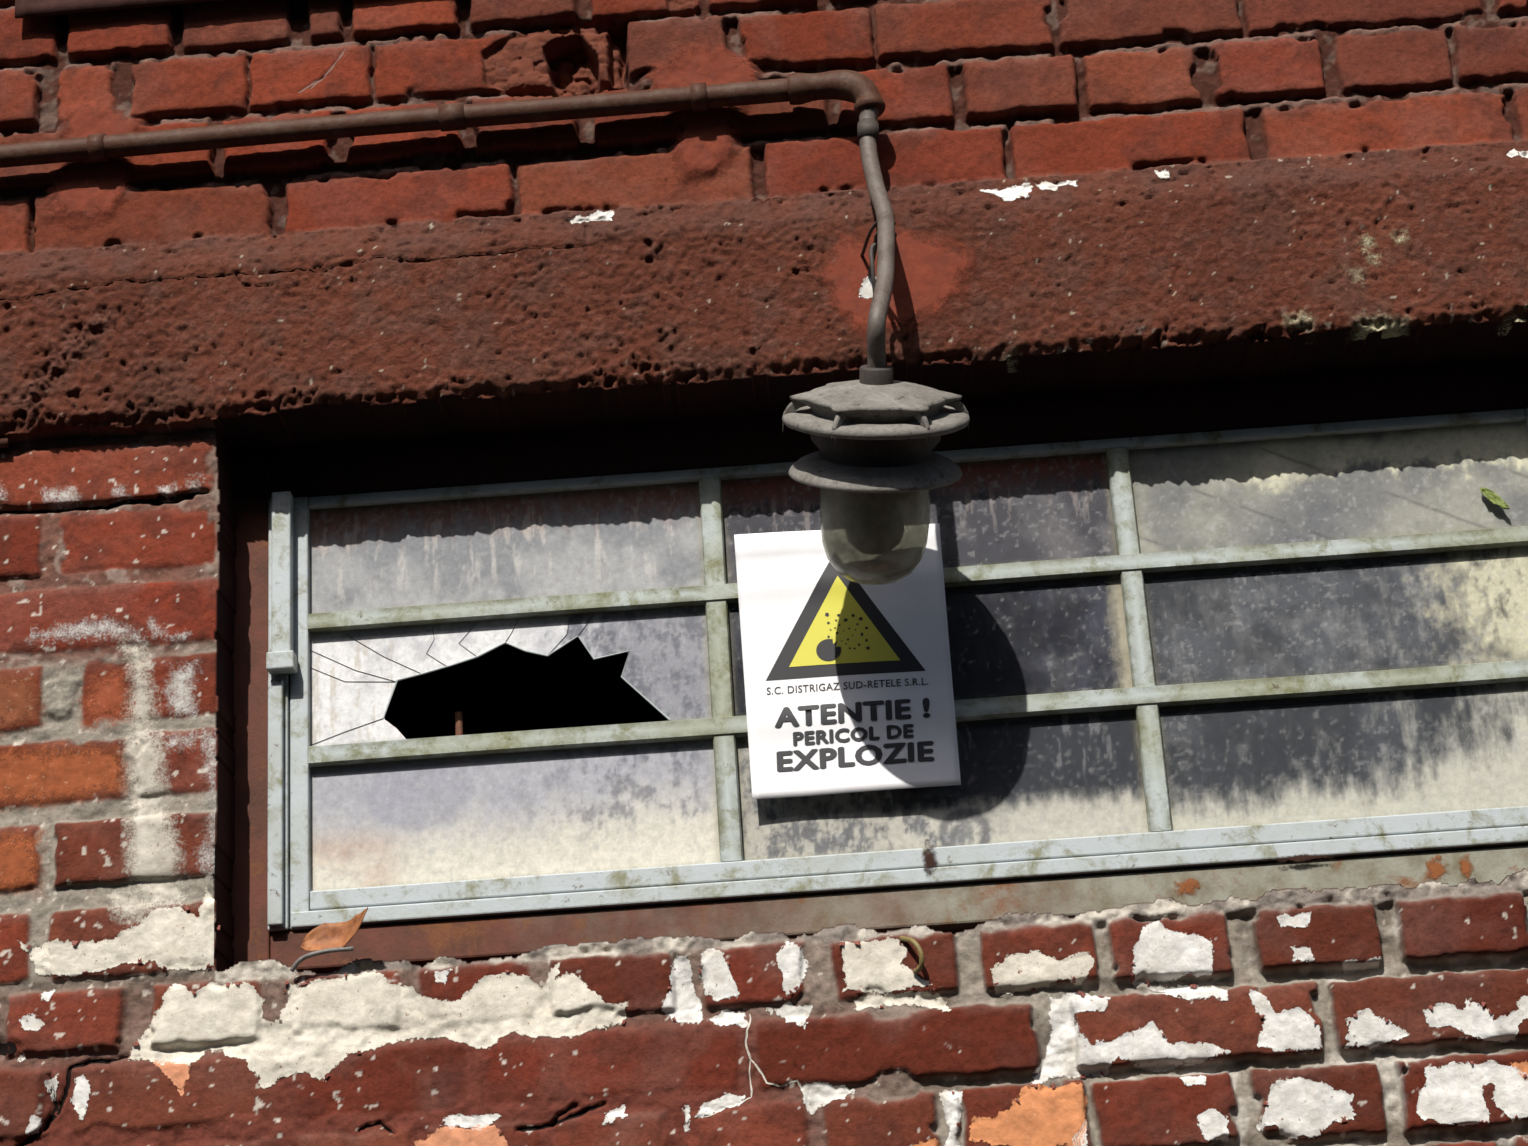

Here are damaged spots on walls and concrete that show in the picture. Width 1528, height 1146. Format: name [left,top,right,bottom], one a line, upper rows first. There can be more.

leakage [32,620,216,923]
peeling [17,887,629,1096]
peeling [661,948,748,1028]
peeling [839,935,952,1012]
peeling [913,950,1231,1146]
peeling [1130,921,1228,1001]
peeling [1249,989,1323,1054]
crack [18,1056,128,1146]
crack [359,1122,395,1134]
crack [518,1103,605,1131]
peeling [1256,1077,1356,1140]
peeling [1416,1060,1528,1128]